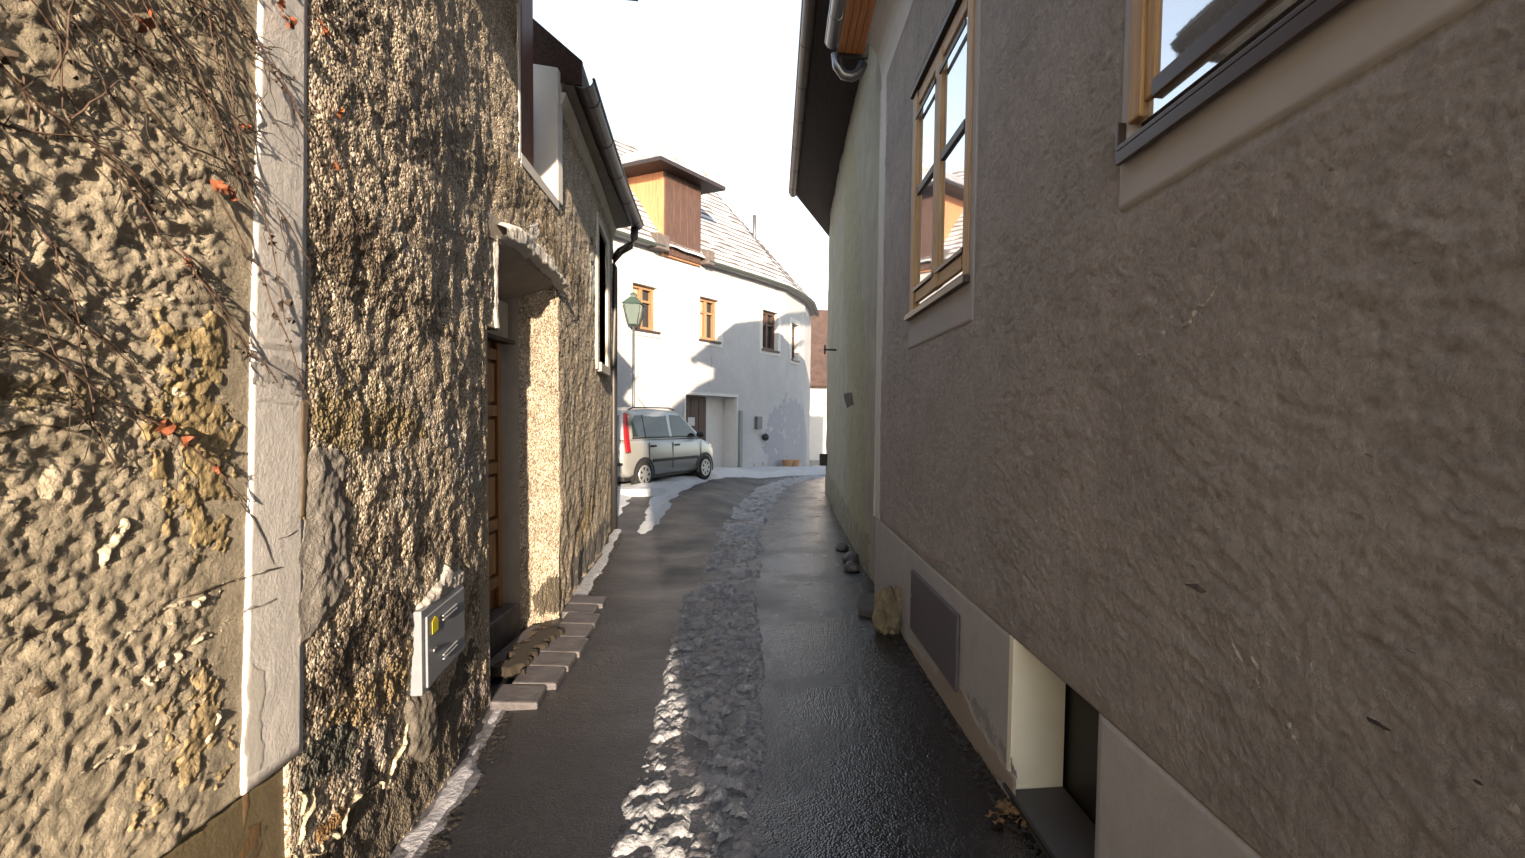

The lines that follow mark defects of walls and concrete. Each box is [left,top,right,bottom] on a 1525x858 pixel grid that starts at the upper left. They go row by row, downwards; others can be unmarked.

spalling [290,293,489,858]